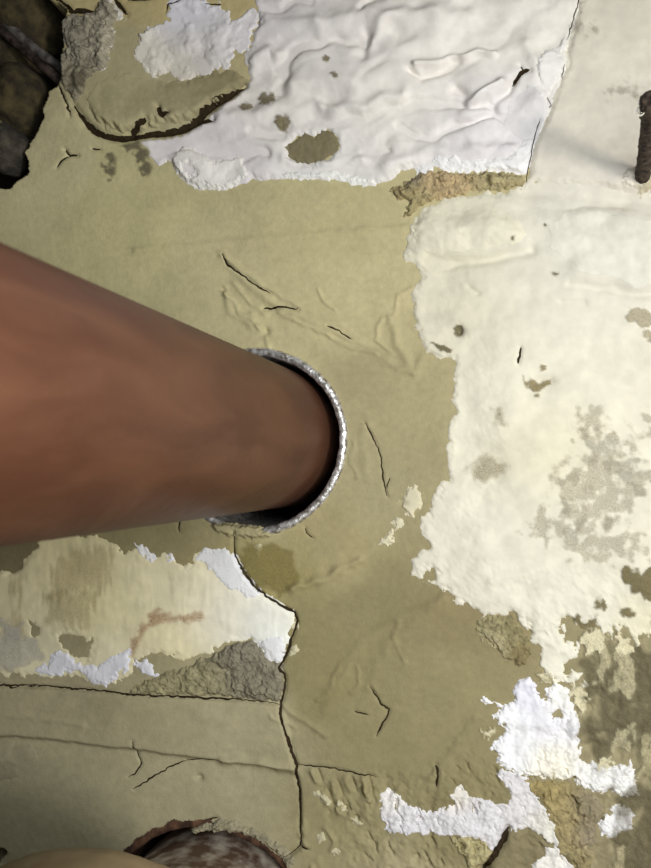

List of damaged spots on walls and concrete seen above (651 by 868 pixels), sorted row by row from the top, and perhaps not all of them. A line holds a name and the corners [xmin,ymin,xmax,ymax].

spalling [60,0,127,102]
peeling [133,0,651,868]
peeling [0,534,300,704]
crack [0,532,377,857]
leakage [581,647,651,758]
leakage [614,785,651,868]